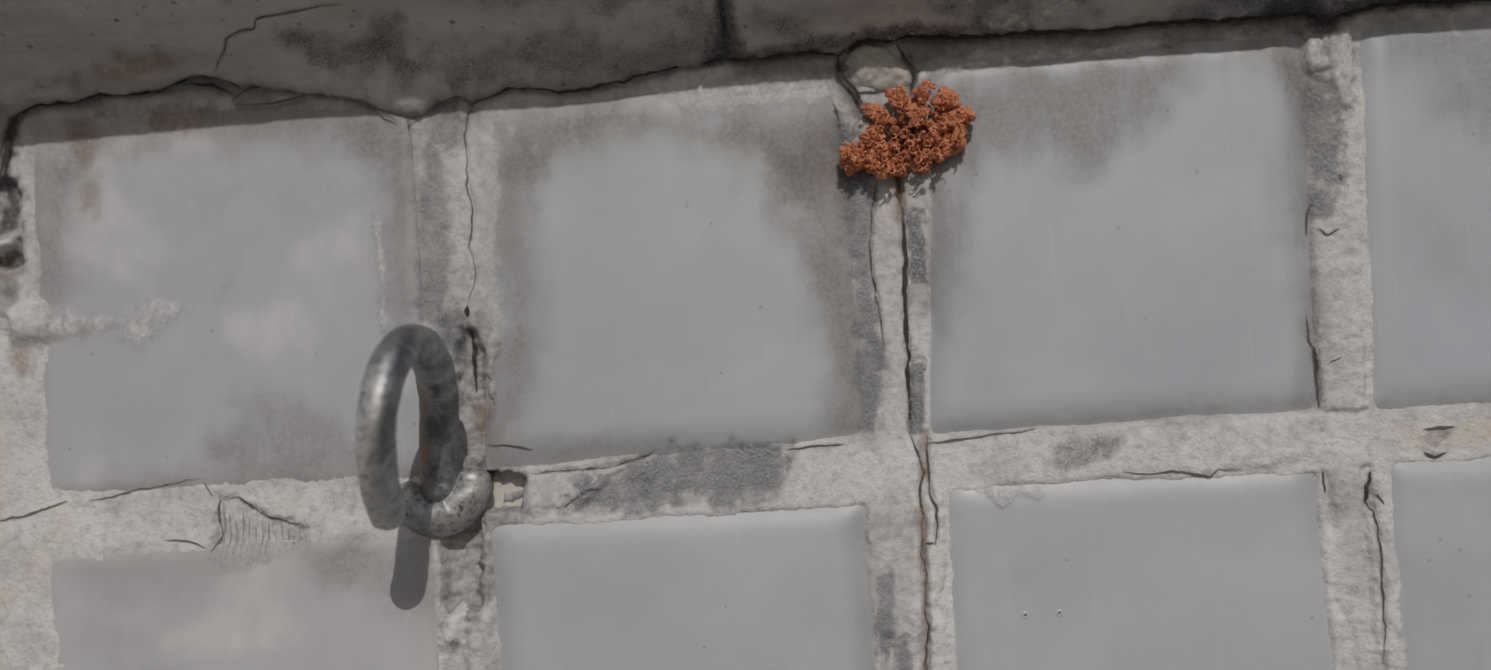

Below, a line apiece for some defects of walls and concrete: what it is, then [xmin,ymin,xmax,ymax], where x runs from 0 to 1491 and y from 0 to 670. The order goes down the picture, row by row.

crack [0,0,1491,393]
crack [1306,314,1341,408]
crack [789,442,845,450]
crack [869,152,1031,670]
crack [1423,426,1455,459]